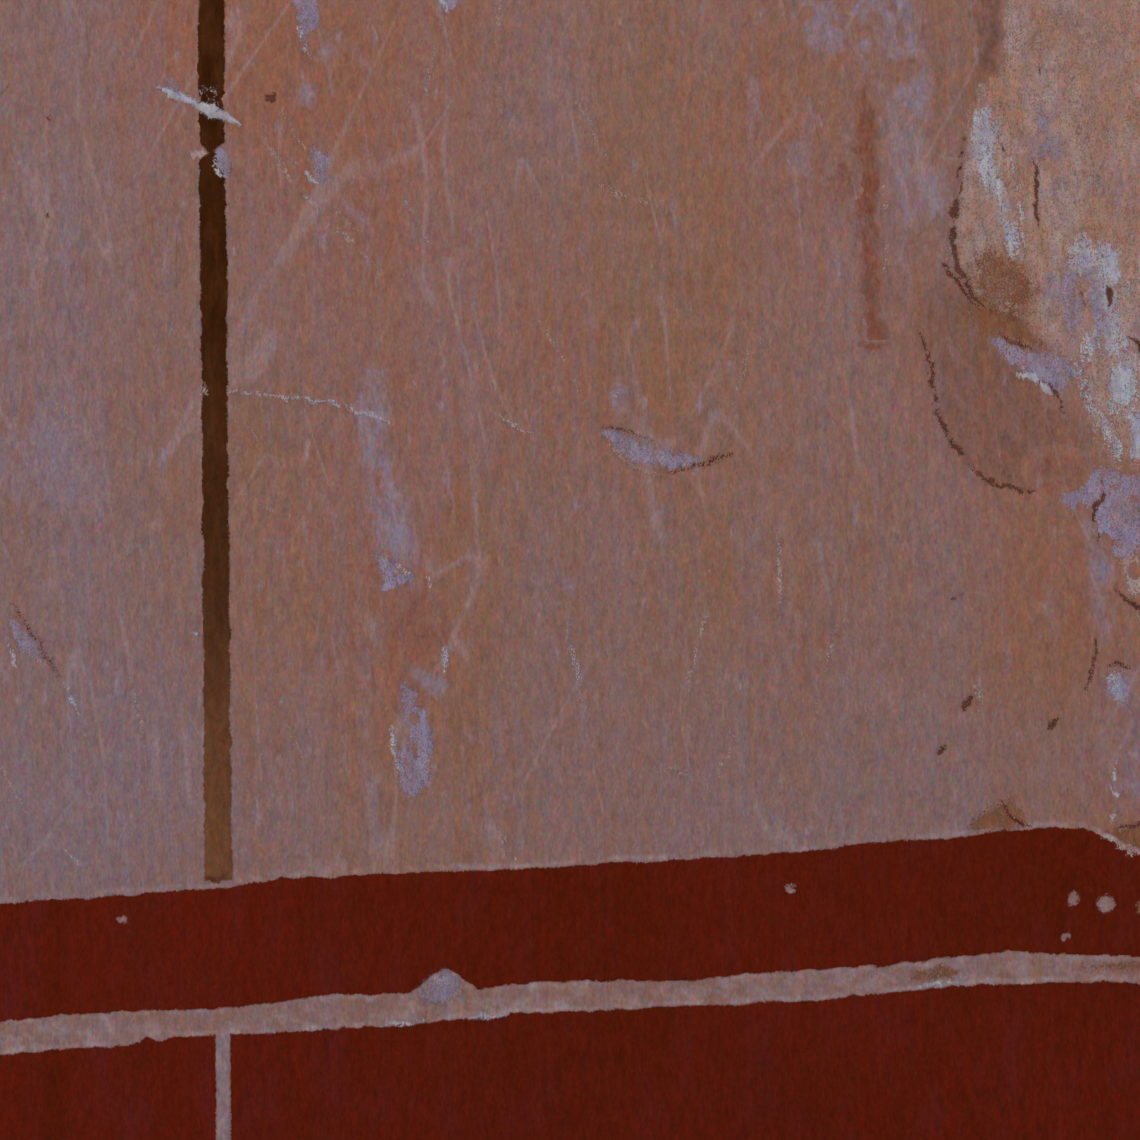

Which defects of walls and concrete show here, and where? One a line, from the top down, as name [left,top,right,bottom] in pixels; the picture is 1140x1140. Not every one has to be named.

peeling [291,0,373,112]
crack [942,263,980,311]
spalling [939,0,1140,651]
spalling [599,377,733,477]
crack [919,332,1035,496]
crack [1038,380,1065,414]
crack [1092,477,1107,541]
crack [1115,589,1140,622]
crack [1084,638,1130,691]